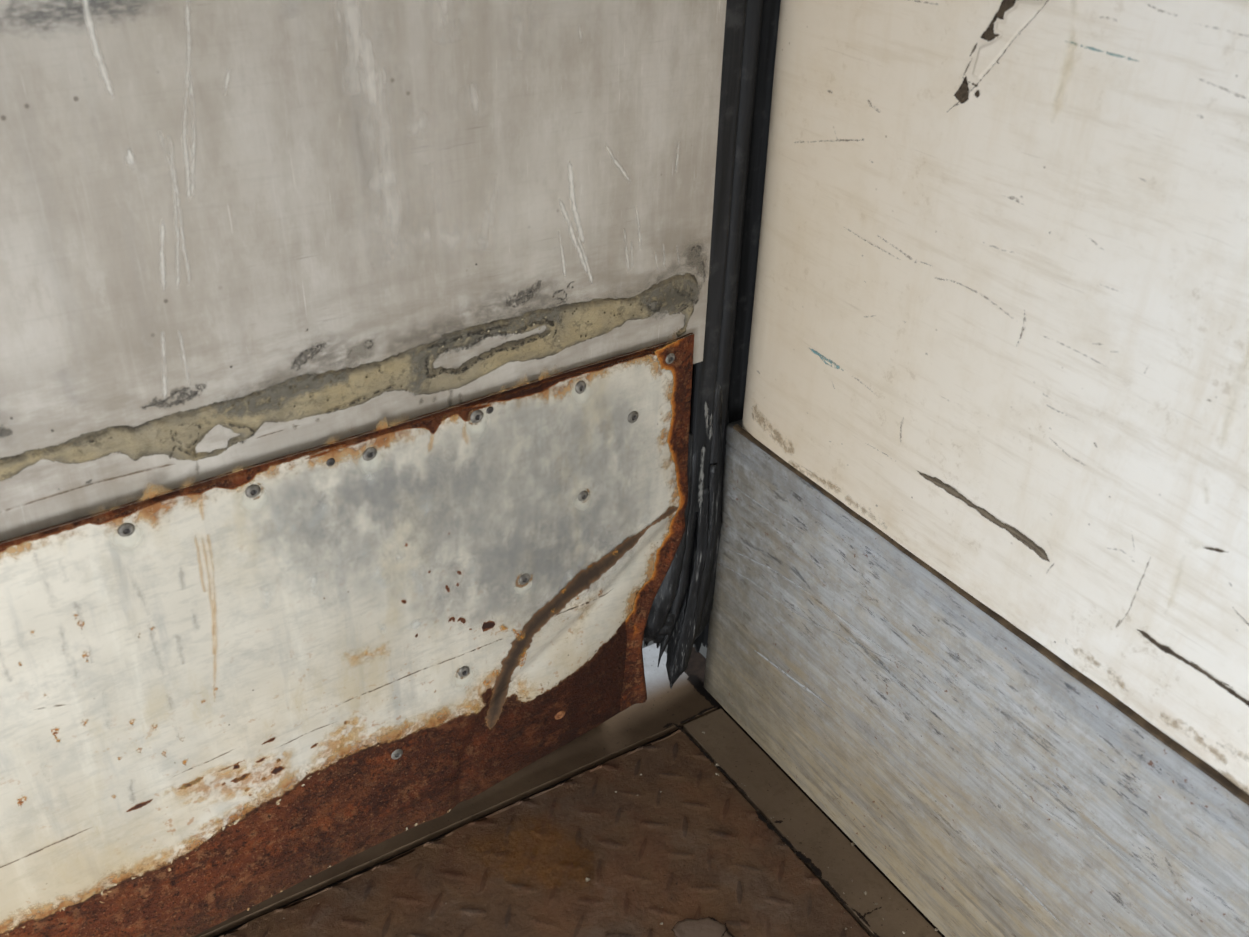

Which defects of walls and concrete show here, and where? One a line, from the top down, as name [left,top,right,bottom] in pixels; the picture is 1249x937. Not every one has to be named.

peeling [947,0,1052,112]
rust [0,334,694,937]